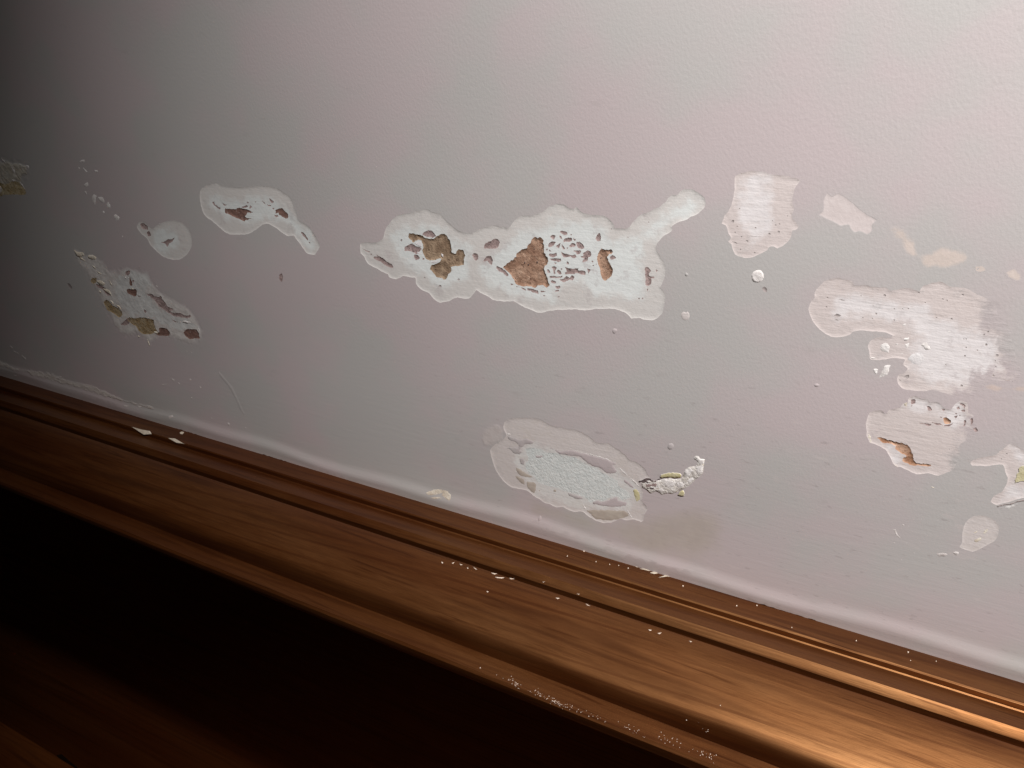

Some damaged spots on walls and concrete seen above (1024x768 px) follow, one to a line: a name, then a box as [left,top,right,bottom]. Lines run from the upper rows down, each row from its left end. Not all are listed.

spalling [72,246,205,347]
peeling [137,220,192,260]
peeling [200,183,320,255]
peeling [360,189,706,320]
peeling [722,171,800,258]
peeling [819,193,877,235]
peeling [808,278,1024,505]
peeling [490,418,705,523]
peeling [937,516,999,556]